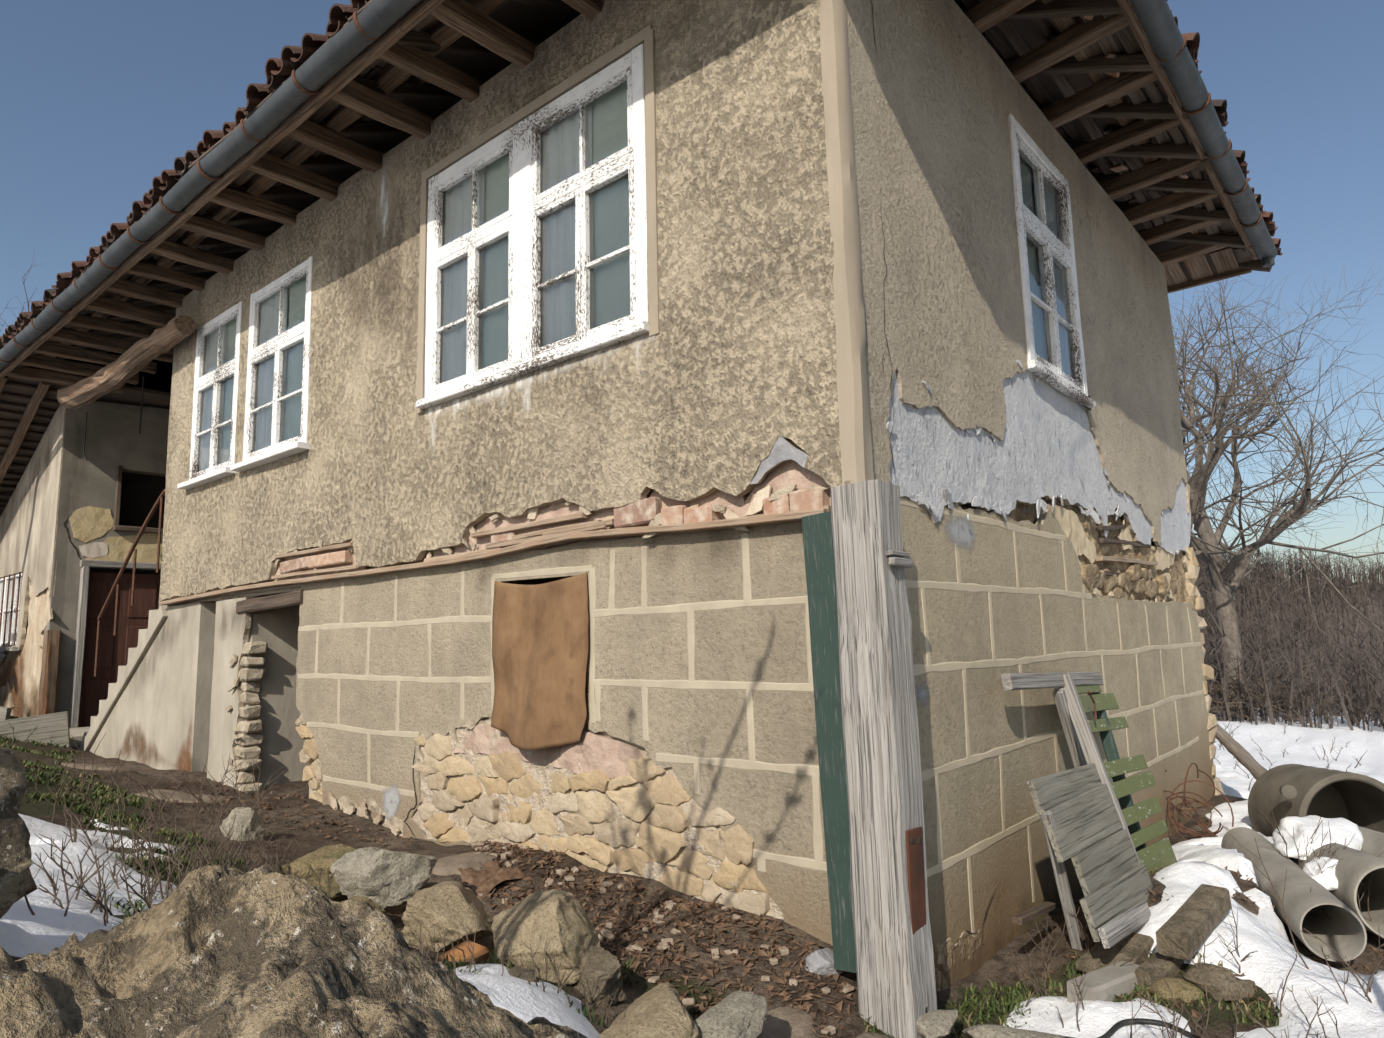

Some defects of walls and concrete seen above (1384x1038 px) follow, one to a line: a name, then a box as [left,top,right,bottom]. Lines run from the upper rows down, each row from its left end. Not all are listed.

crack [880,203,896,484]
spalling [271,540,370,581]
spalling [424,436,831,562]
flaking render [886,360,1197,611]